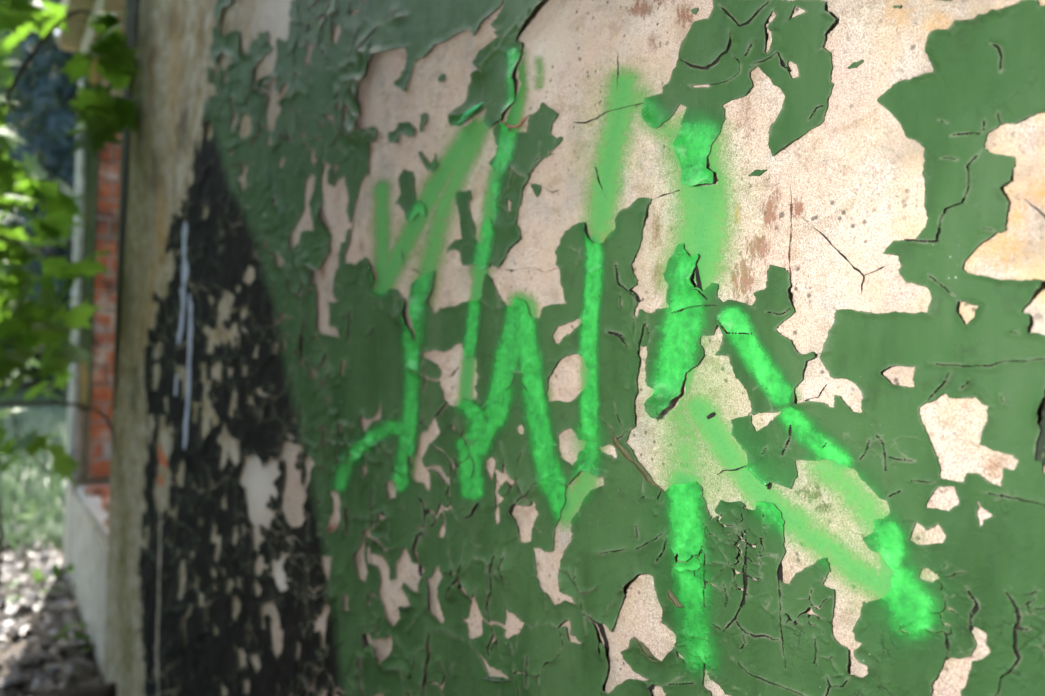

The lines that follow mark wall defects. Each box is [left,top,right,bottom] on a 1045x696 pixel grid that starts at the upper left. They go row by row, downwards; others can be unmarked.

peeling [289,0,1020,413]
crack [672,265,717,313]
crack [788,188,889,294]
crack [904,114,1003,243]
peeling [964,113,1045,335]
peeling [175,250,314,657]
peeling [601,325,781,520]
peeling [920,393,1018,511]
peeling [514,501,578,605]
peeling [588,574,685,696]
peeling [781,531,877,677]
peeling [932,627,990,696]